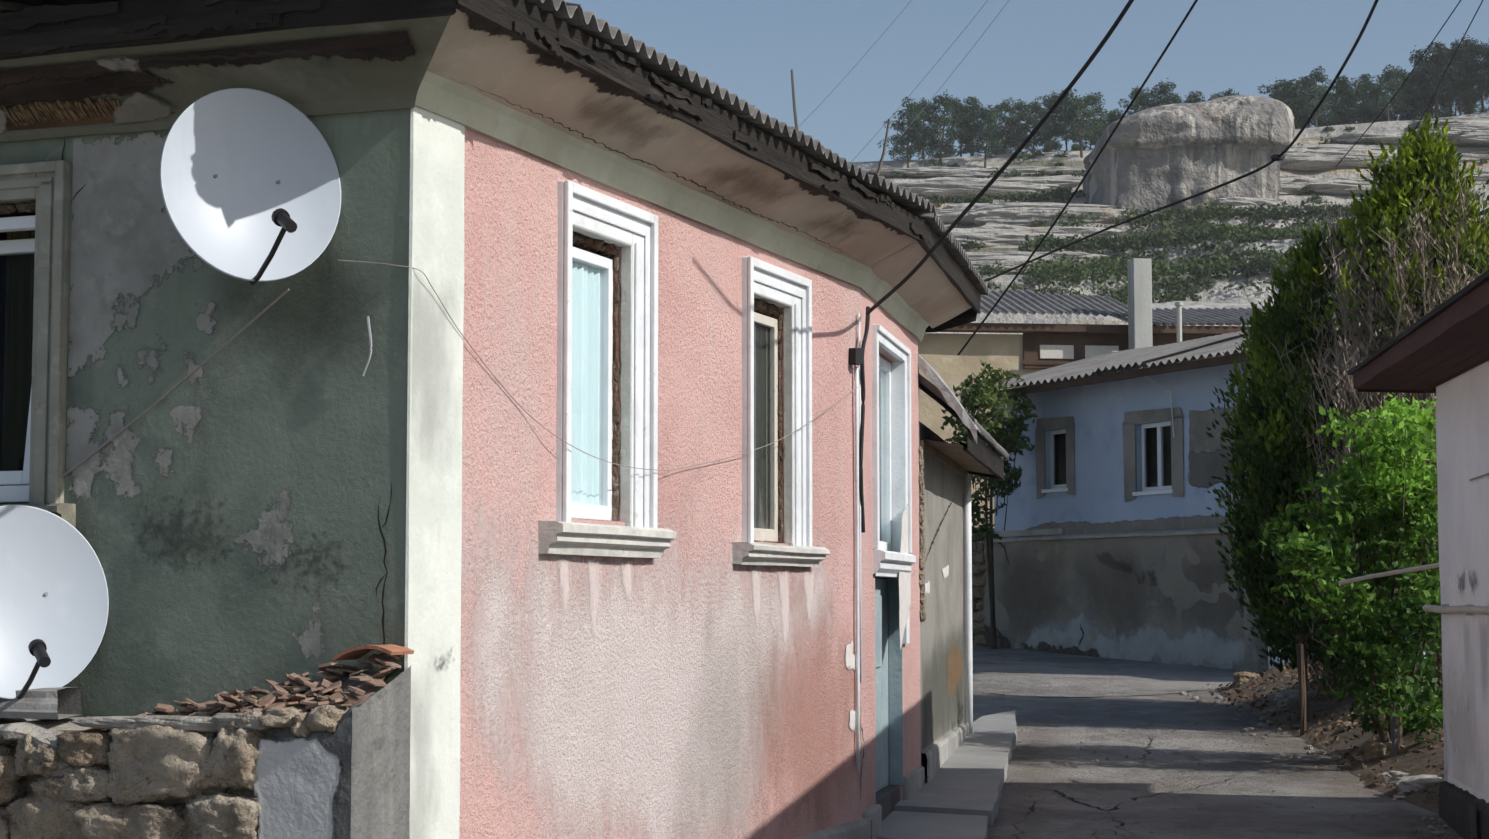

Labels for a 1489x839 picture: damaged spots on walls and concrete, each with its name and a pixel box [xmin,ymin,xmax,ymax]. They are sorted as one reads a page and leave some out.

peeling [0,31,416,506]
peeling [234,487,299,574]
peeling [291,602,336,660]
water stain [623,563,631,593]
water stain [780,572,788,639]
spalling [984,625,1100,657]
crack [1010,689,1329,839]